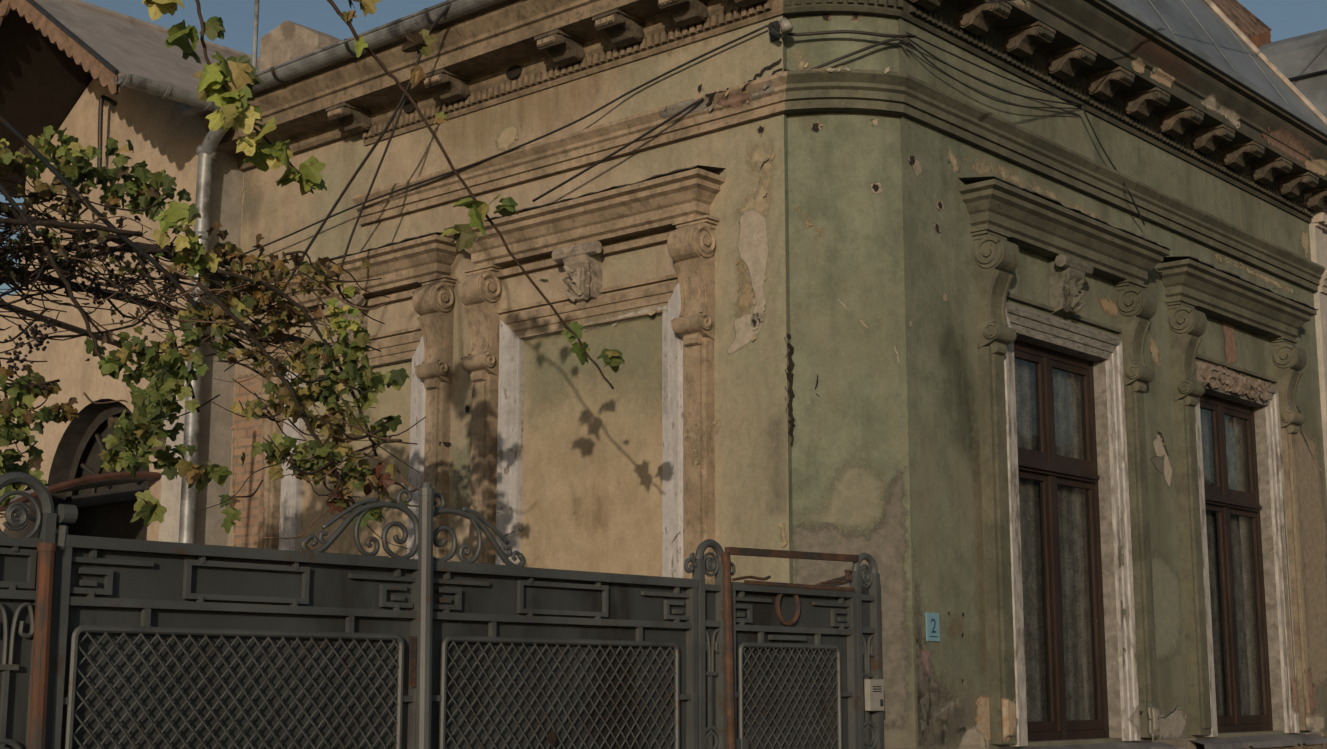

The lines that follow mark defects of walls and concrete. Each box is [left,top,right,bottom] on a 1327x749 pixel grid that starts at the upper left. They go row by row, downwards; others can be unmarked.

flaking render [727,129,775,354]
crack [784,333,820,446]
flaking render [1153,435,1172,487]
flaking render [777,472,1018,749]